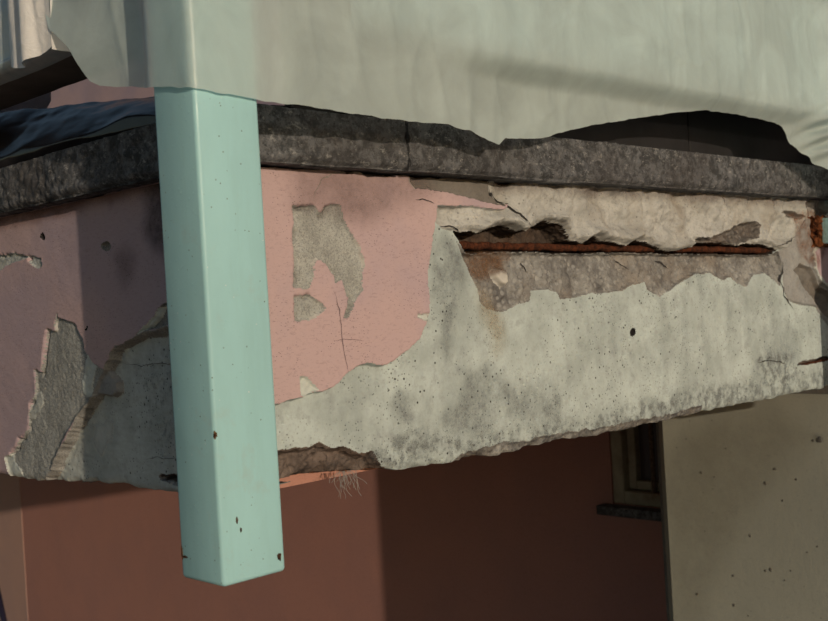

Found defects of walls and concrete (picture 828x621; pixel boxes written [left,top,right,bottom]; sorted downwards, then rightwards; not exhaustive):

peeling [0,253,42,270]
flaking render [4,303,178,492]
flaking render [409,177,506,207]
flaking render [275,200,828,484]